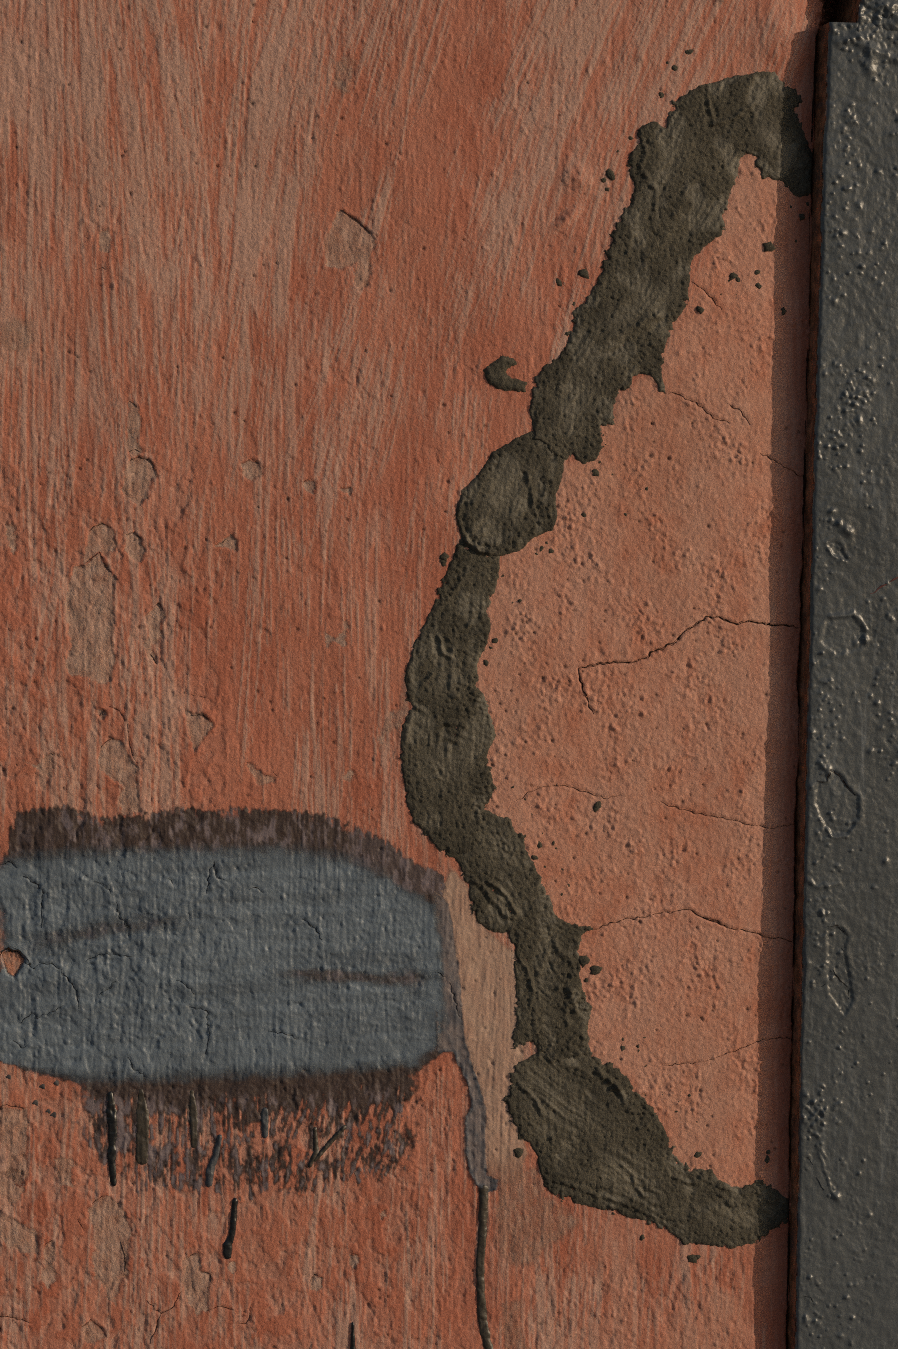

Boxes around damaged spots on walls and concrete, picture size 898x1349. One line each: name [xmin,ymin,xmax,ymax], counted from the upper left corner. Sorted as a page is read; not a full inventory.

crack [810,35,818,142]
crack [665,349,808,561]
peeling [64,522,145,684]
crack [579,616,799,755]
crack [593,804,795,1066]
crack [784,1193,792,1349]